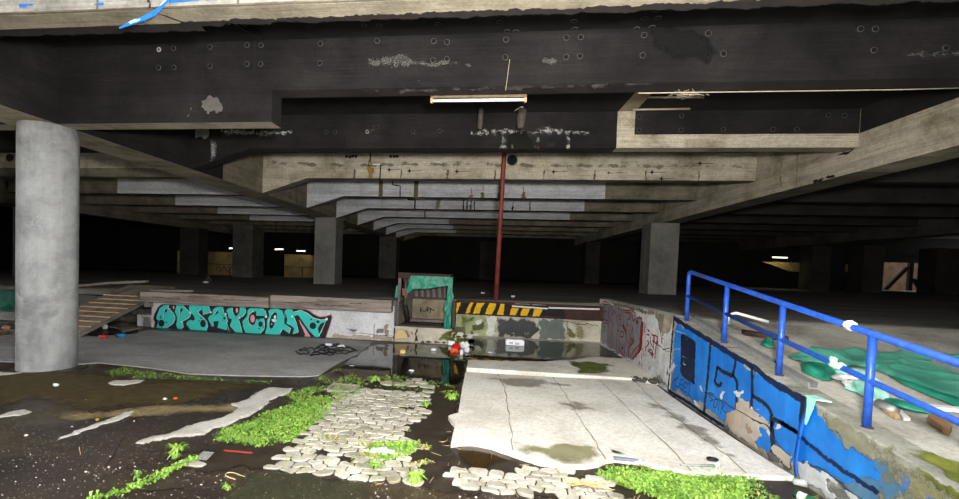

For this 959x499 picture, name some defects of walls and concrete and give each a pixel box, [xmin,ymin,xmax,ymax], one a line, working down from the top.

peeling [187,95,223,117]
spalling [655,312,673,339]
peeling [720,390,859,499]
peeling [823,413,876,460]